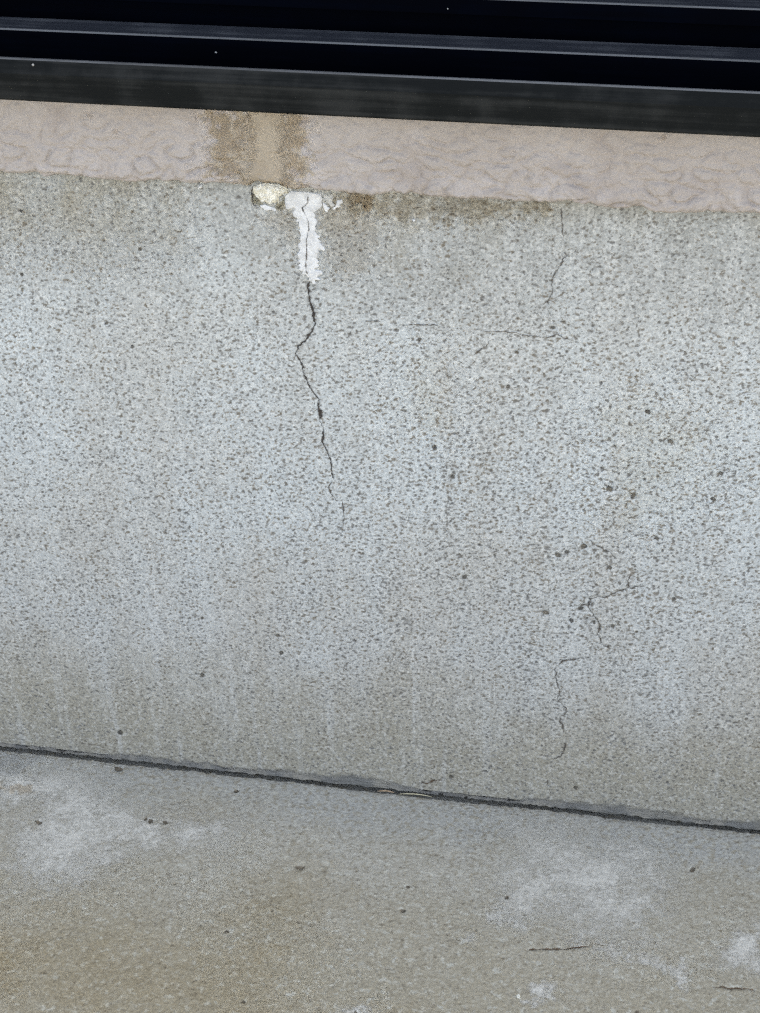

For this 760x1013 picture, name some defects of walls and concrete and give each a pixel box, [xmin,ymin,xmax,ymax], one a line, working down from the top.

water stain [248,112,343,284]
crack [295,281,345,525]
crack [547,574,642,793]